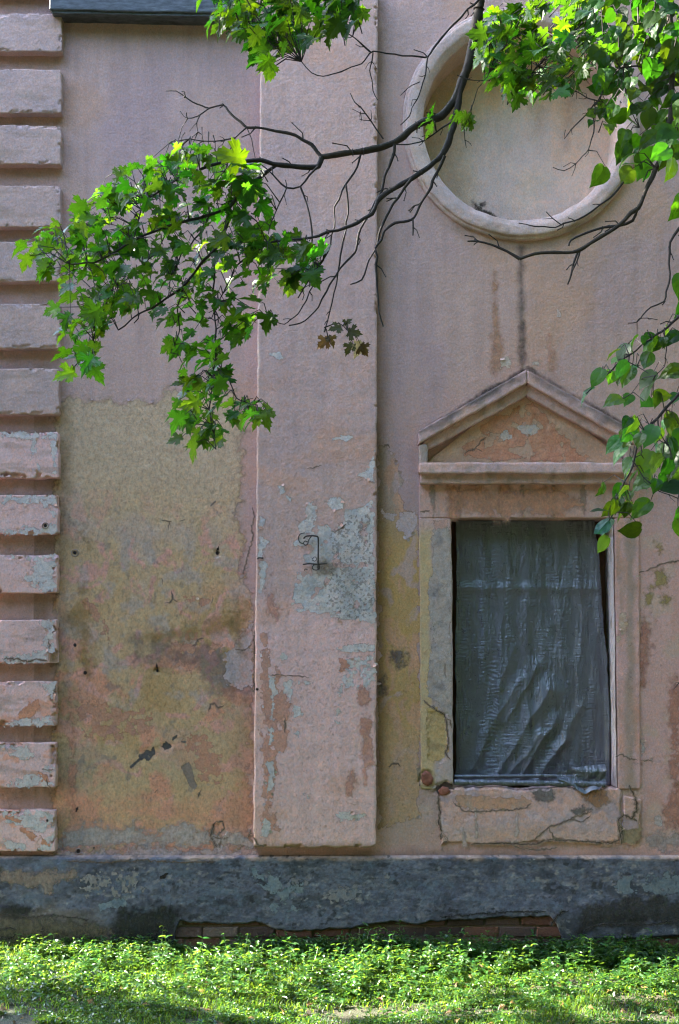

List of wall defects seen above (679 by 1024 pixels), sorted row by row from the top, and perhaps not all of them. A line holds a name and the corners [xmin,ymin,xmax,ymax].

peeling [462,402,592,463]
peeling [0,390,310,855]
peeling [291,444,532,829]
crack [436,785,638,851]
water stain [0,819,257,899]